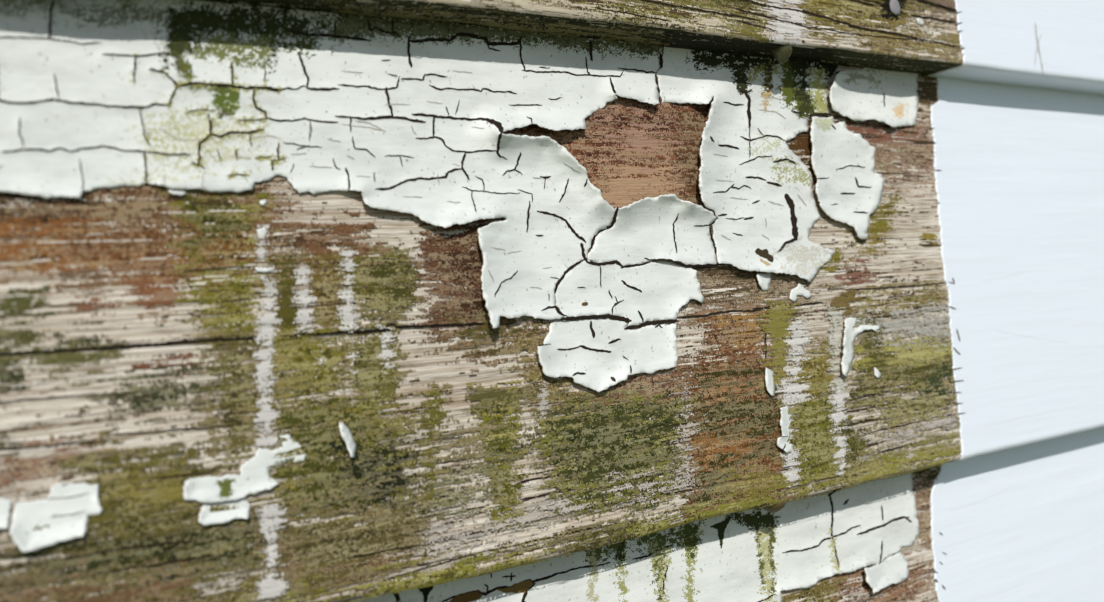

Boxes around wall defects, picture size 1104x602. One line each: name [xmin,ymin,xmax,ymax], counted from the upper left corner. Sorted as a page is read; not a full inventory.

crack [596,0,960,47]
damp [762,0,811,46]
peeling [0,0,919,396]
damp [0,175,317,448]
crack [0,302,491,356]
damp [408,218,553,372]
crack [677,302,823,362]
crack [846,282,946,290]
damp [0,249,959,602]
peeling [0,483,103,552]
peeling [182,434,306,526]
peeling [342,473,919,602]